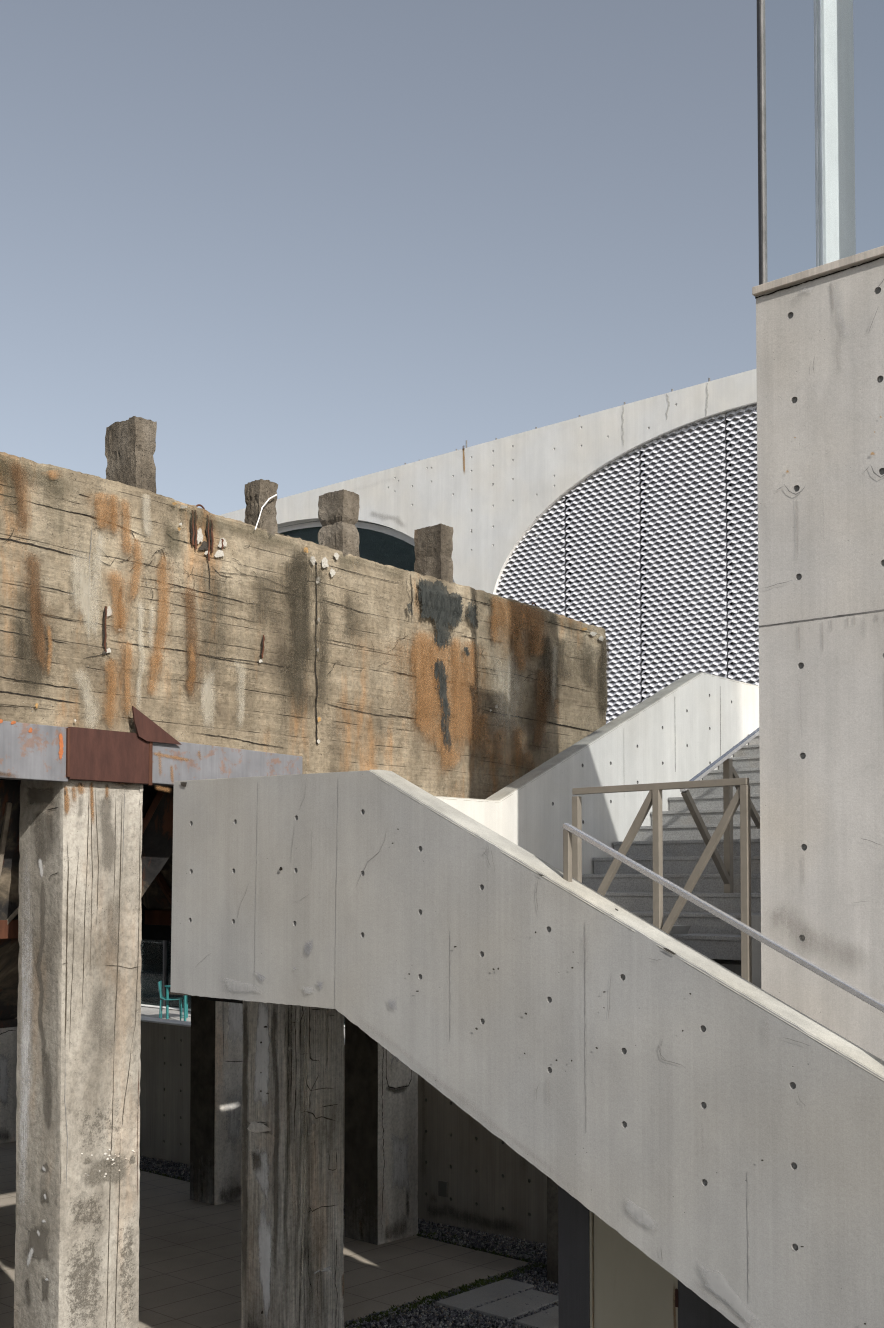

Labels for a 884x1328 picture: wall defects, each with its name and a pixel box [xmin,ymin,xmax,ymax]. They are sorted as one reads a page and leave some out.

corrosion [28,554,52,670]
corrosion [97,493,141,626]
corrosion [150,558,168,690]
corrosion [187,588,197,694]
leakage [290,552,325,704]
corrosion [414,633,477,764]
corrosion [492,597,543,670]